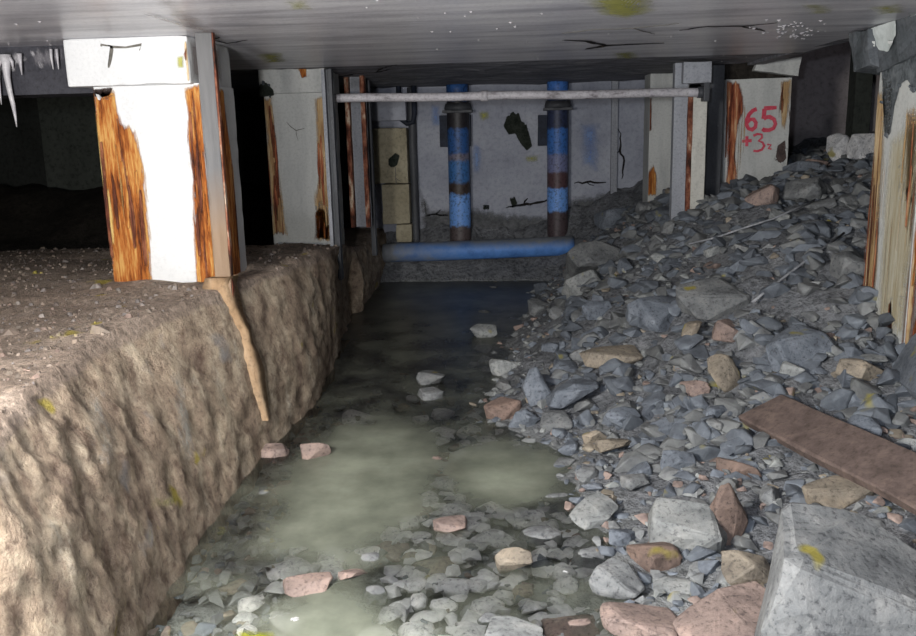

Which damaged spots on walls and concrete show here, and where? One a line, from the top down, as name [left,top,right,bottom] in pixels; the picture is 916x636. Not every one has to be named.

rust [93,90,152,282]
rust [184,42,215,282]
rust [211,32,241,298]
rust [264,99,286,235]
rust [315,97,330,241]
spalling [388,153,399,169]
spalling [504,110,532,150]
crack [574,129,625,186]
crack [562,22,777,49]
rust [725,81,745,184]
rust [862,94,916,345]
spalling [879,57,916,138]